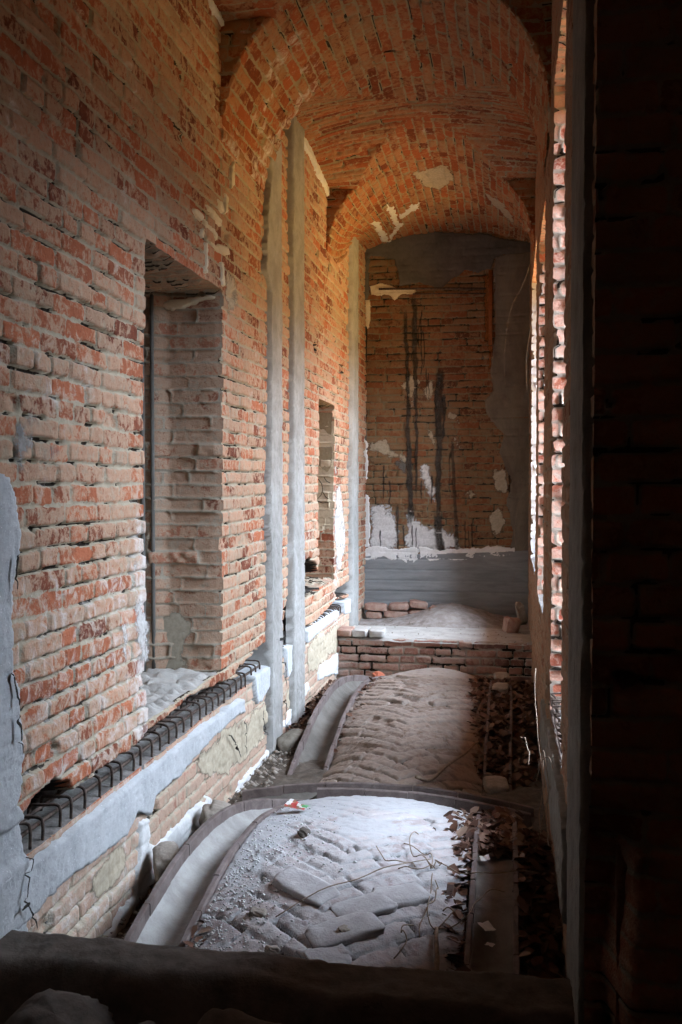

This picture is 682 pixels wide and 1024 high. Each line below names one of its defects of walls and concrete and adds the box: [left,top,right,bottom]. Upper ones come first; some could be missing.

water stain [370,298,475,551]
water stain [493,469,512,498]
flaking render [365,495,515,563]
water stain [489,508,505,535]
flaking render [198,704,269,792]
crack [22,857,38,928]